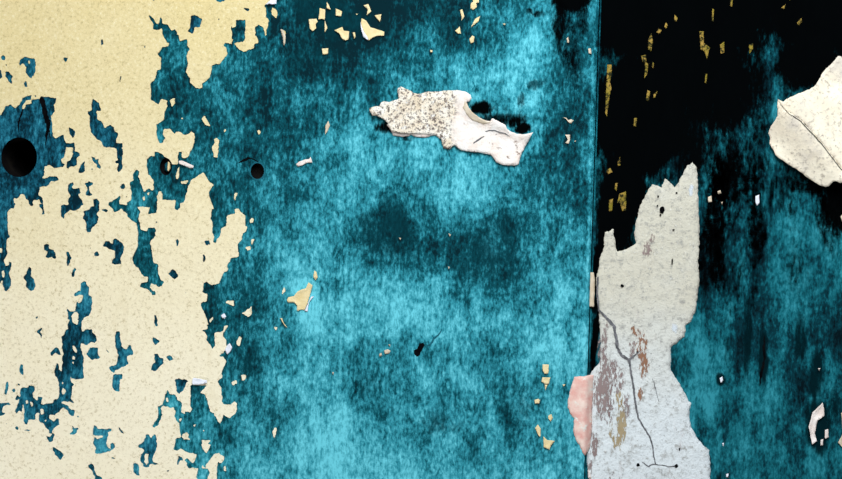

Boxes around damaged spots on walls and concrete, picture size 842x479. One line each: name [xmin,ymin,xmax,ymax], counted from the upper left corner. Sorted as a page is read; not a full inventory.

peeling [641,15,678,78]
peeling [699,31,710,58]
flaking render [369,87,533,166]
peeling [768,56,842,187]
peeling [0,0,278,479]
flaking render [563,162,723,479]
peeling [541,364,550,390]
crack [596,277,675,467]
peeling [535,425,554,450]
peeling [809,403,829,446]